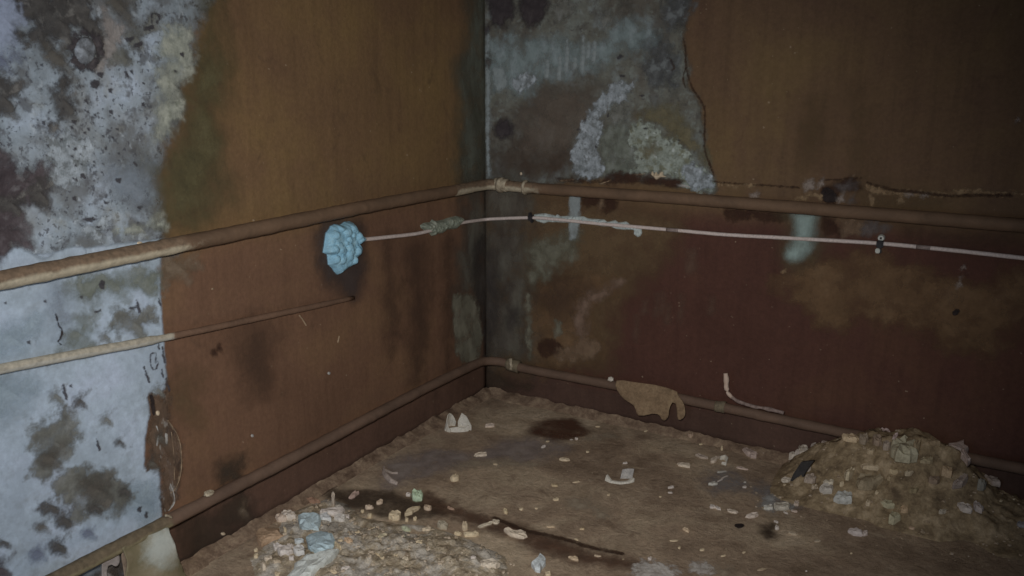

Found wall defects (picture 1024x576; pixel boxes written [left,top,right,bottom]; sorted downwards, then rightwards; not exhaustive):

flaking render [0,0,212,270]
peeling [485,0,716,194]
crack [671,43,1024,198]
leakage [458,190,678,389]
leakage [31,540,67,560]
leakage [28,385,148,537]
flaking render [0,254,186,576]
peeling [608,377,685,421]